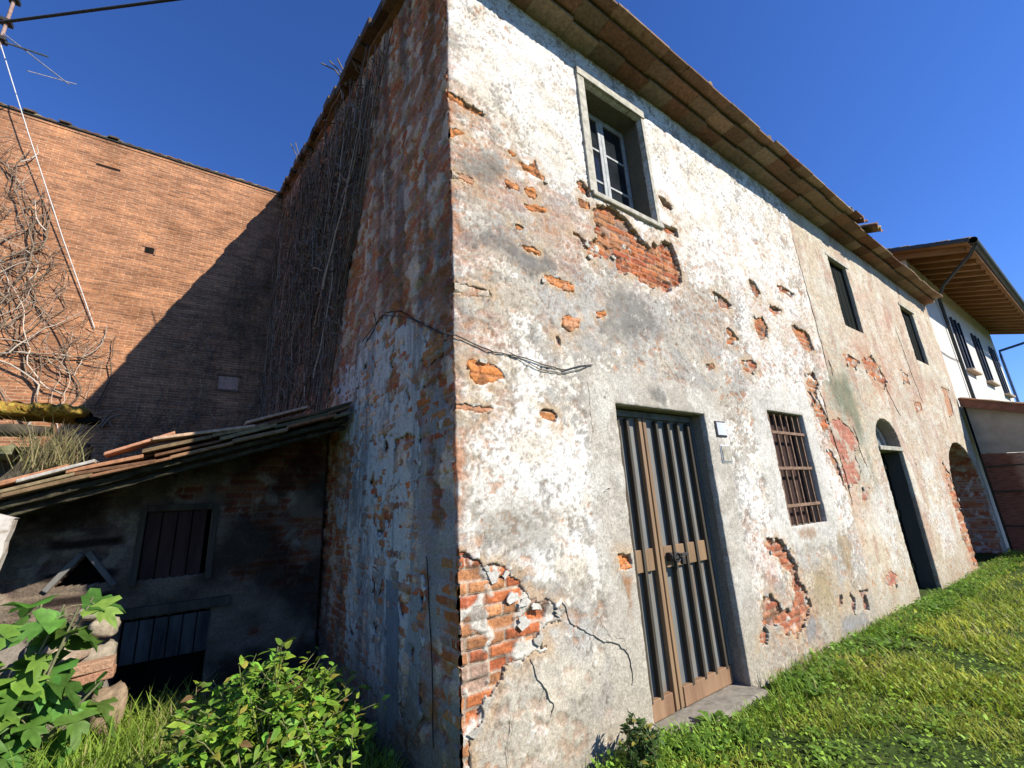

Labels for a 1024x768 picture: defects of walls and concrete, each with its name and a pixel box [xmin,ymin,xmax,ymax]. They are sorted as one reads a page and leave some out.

flaking render [504,150,548,213]
flaking render [573,181,680,292]
flaking render [541,275,574,293]
flaking render [556,316,580,346]
flaking render [843,354,888,389]
flaking render [804,370,870,501]
flaking render [331,312,563,768]
flaking render [618,553,632,570]
flaking render [759,538,810,643]
flaking render [943,461,978,567]
crack [562,601,634,685]
crack [530,659,555,717]